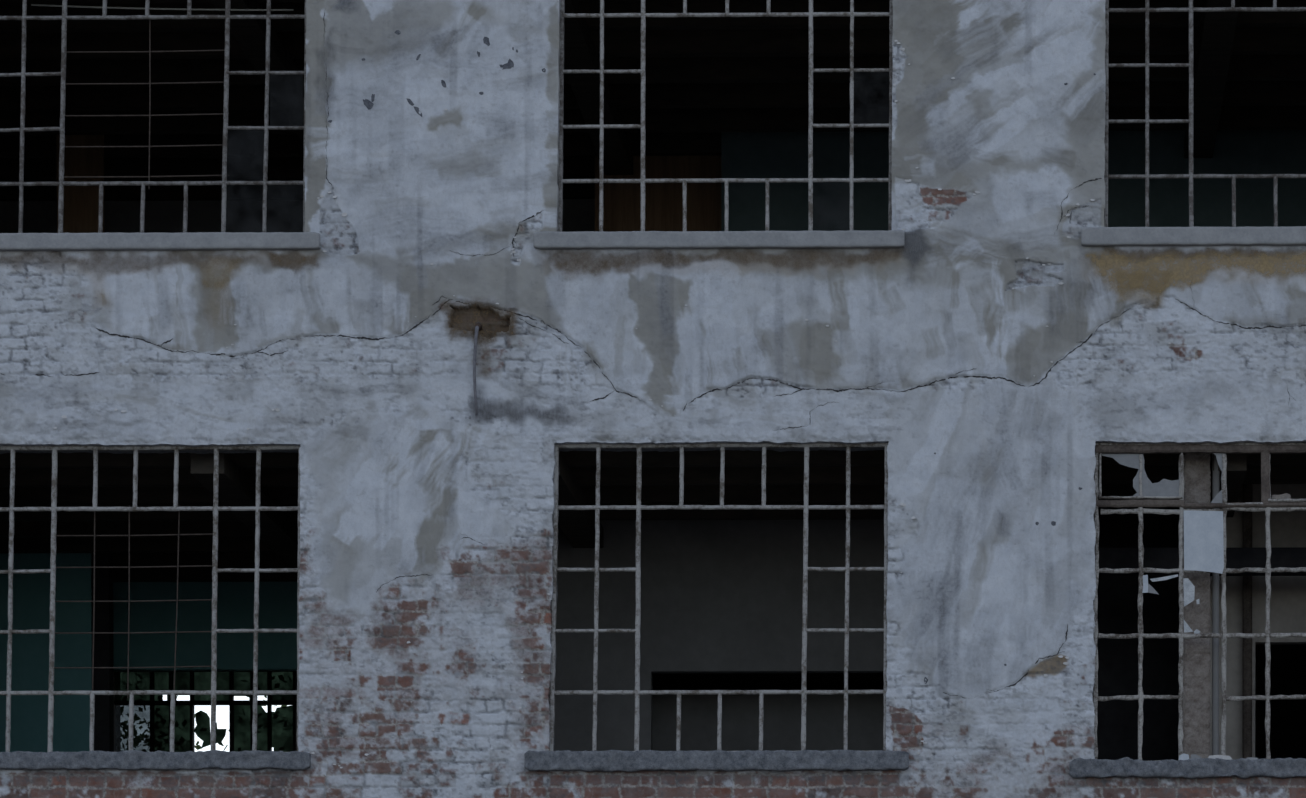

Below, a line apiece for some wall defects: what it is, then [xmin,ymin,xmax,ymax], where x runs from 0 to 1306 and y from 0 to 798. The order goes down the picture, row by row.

peeling [892,0,980,232]
peeling [196,267,238,353]
crack [96,296,637,401]
peeling [397,262,549,329]
crack [683,287,1306,431]
peeling [1168,342,1203,361]
peeling [0,546,552,798]
flaking render [1025,655,1069,677]